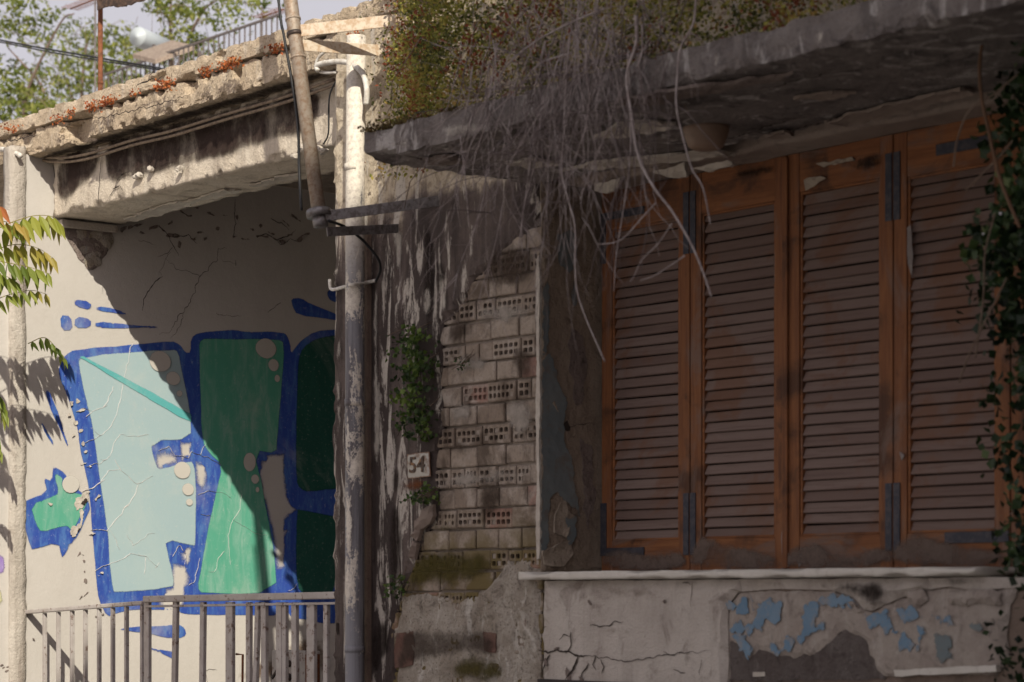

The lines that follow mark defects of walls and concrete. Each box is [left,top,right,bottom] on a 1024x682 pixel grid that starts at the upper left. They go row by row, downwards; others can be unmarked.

water stain [57,91,301,197]
flaking render [64,173,298,270]
crack [142,199,236,335]
peeling [804,157,854,191]
crack [82,344,267,585]
peeling [540,282,580,567]
crack [539,621,706,680]
flaking render [726,588,1018,682]